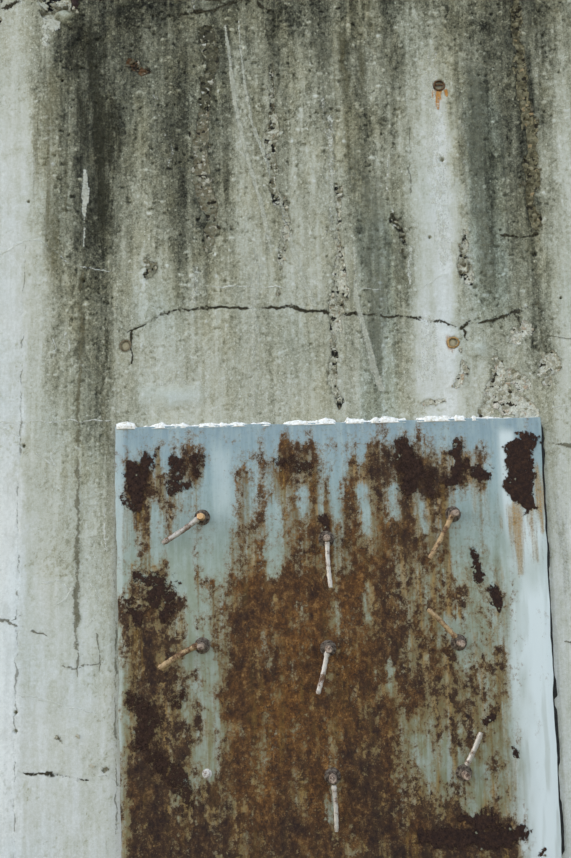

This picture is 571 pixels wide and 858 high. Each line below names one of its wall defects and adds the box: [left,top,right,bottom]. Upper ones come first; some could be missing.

spalling [38,0,79,19]
water stain [75,22,120,247]
water stain [223,20,316,307]
spalling [508,0,543,231]
water stain [353,197,398,391]
crack [128,303,538,364]
spalling [478,350,562,418]
corrosion [119,449,206,513]
corrosion [502,430,544,559]
corrosion [470,547,503,613]
crack [0,618,47,636]
crack [24,771,89,781]